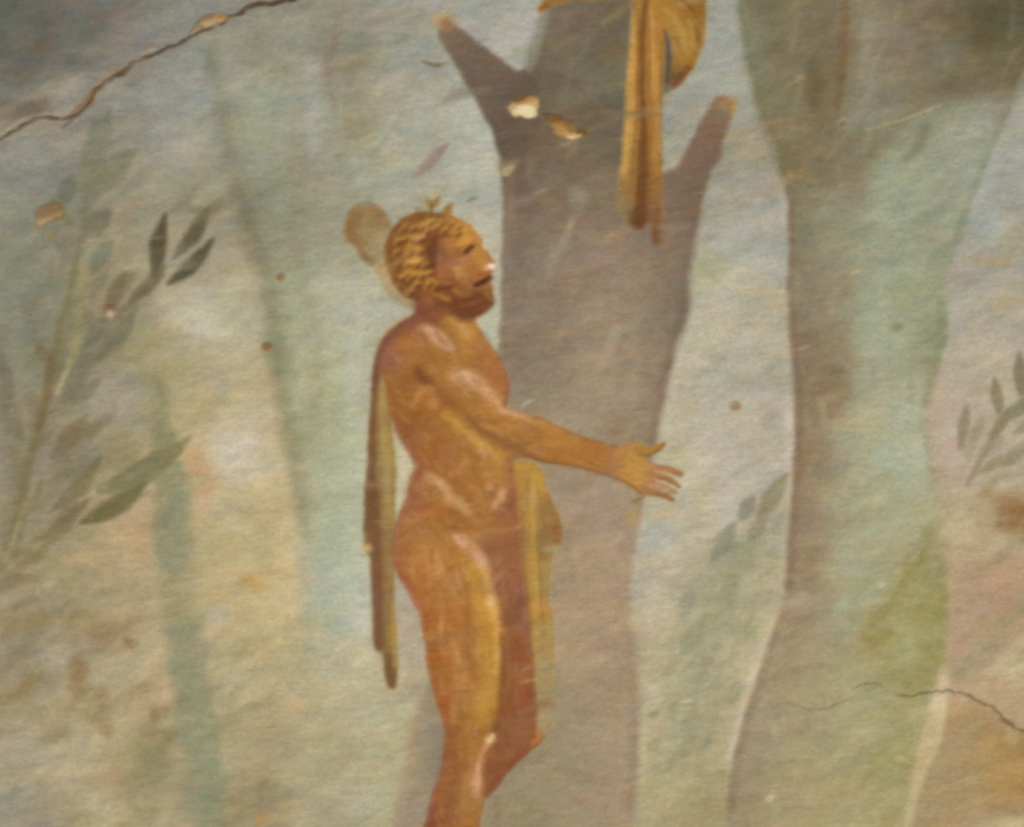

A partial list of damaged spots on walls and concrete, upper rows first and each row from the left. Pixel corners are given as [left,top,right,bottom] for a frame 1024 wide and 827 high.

crack [0,0,296,141]
spalling [508,95,586,146]
spalling [35,201,65,242]
crack [791,683,1024,732]